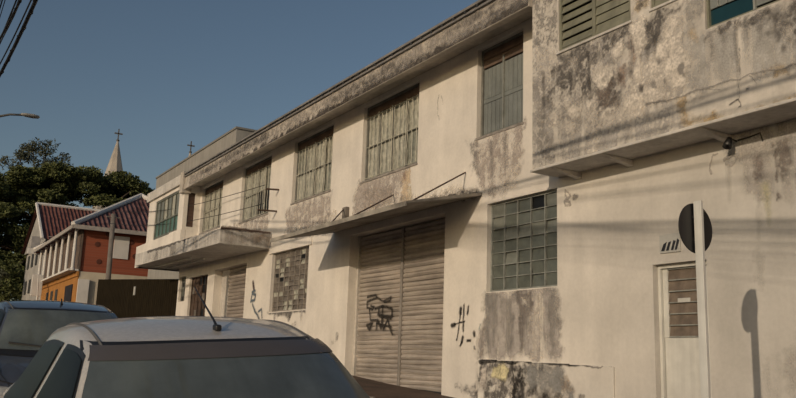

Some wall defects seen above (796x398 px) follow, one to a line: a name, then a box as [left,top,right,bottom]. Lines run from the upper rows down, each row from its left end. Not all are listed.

damp [189,0,796,199]
crack [646,63,796,105]
damp [464,288,573,398]